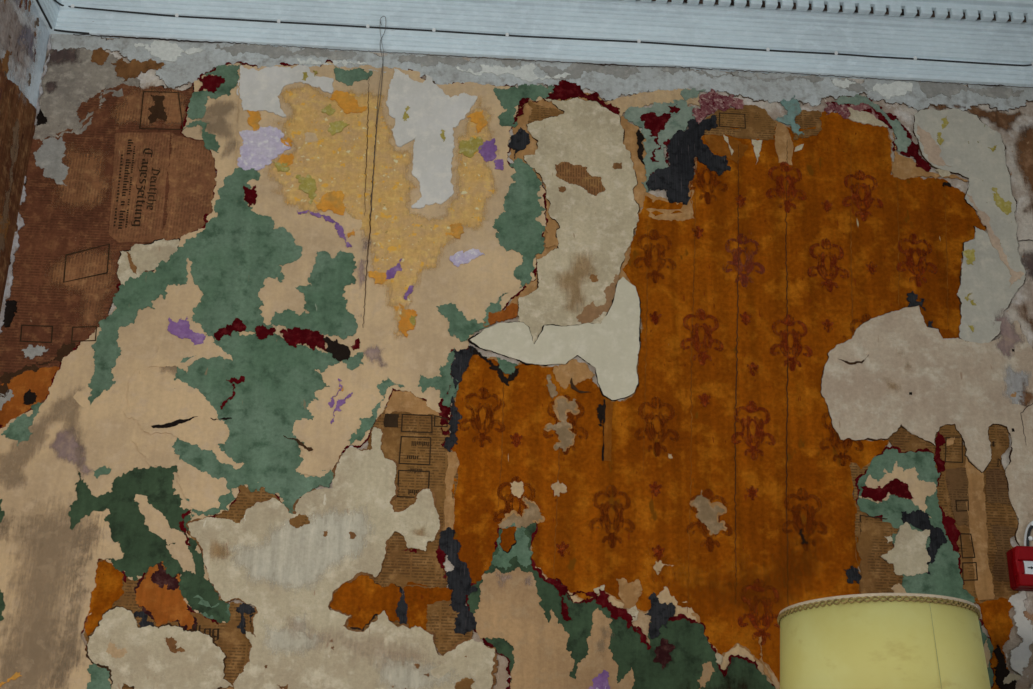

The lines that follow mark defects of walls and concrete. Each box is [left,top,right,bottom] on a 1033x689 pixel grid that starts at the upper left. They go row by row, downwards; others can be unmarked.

peeling [0,0,1033,546]
leakage [1021,252,1033,278]
leakage [996,315,1033,407]
peeling [86,426,498,689]
peeling [881,522,931,593]
peeling [1008,591,1033,676]